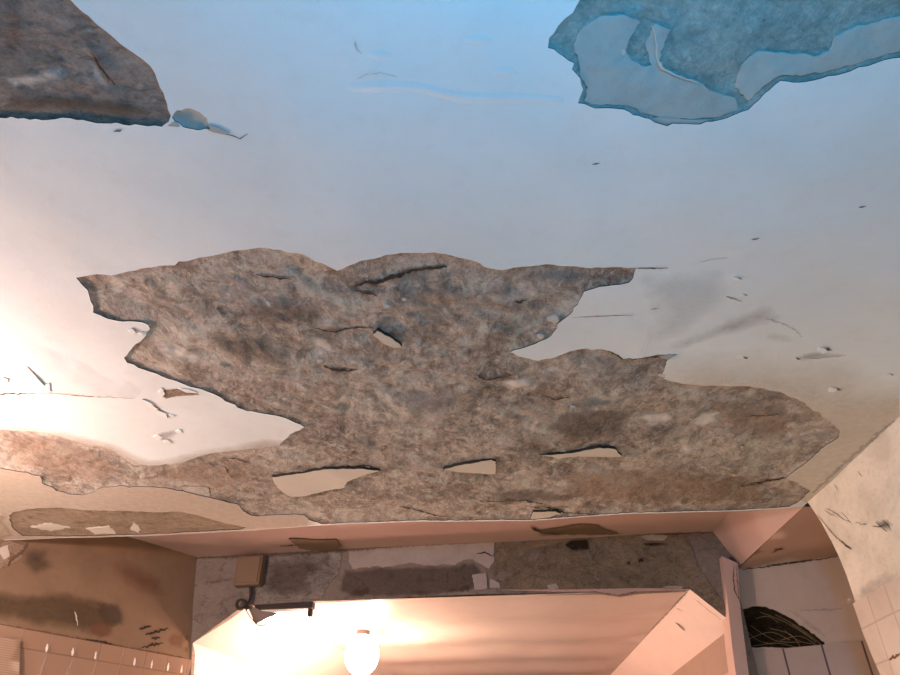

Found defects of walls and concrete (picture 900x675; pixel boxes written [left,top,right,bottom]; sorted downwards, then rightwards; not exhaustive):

flaking render [0,0,247,139]
flaking render [548,0,900,125]
flaking render [0,248,839,615]
damp [0,596,121,630]